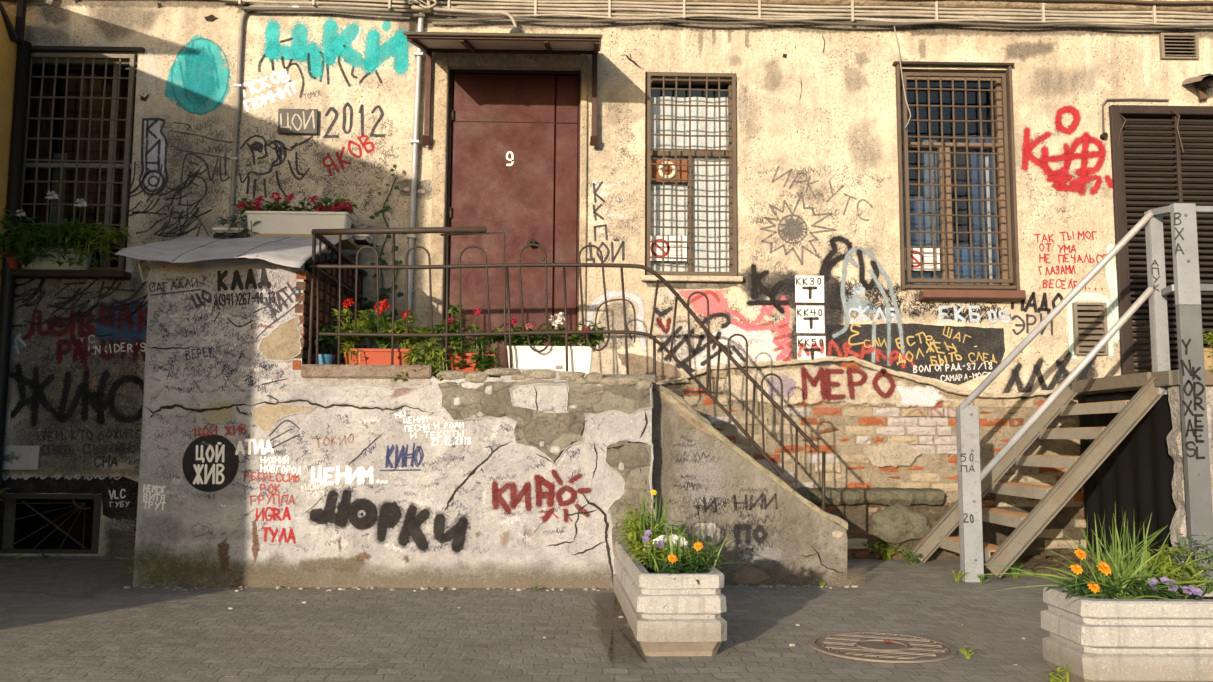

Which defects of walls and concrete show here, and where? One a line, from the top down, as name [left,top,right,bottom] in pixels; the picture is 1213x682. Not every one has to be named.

spalling [257,316,302,363]
spalling [1078,322,1101,353]
spalling [1132,320,1152,371]
spalling [203,399,236,425]
spalling [251,401,317,433]
crack [143,389,440,467]
spalling [301,351,1057,506]
spalling [982,396,1084,507]
crack [442,387,648,582]